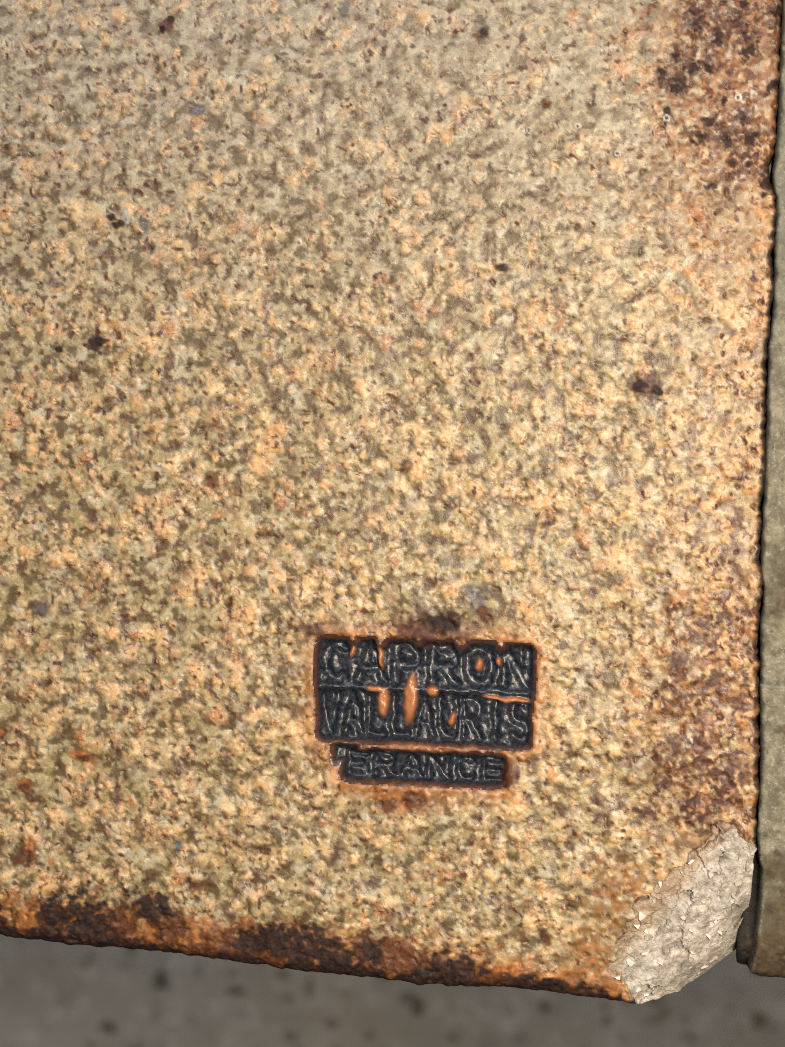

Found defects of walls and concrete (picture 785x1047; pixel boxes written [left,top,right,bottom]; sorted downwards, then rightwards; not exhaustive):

corrosion [657,0,782,210]
corrosion [682,596,755,647]
corrosion [632,653,750,841]
corrosion [574,878,640,973]
spalling [608,820,757,1004]